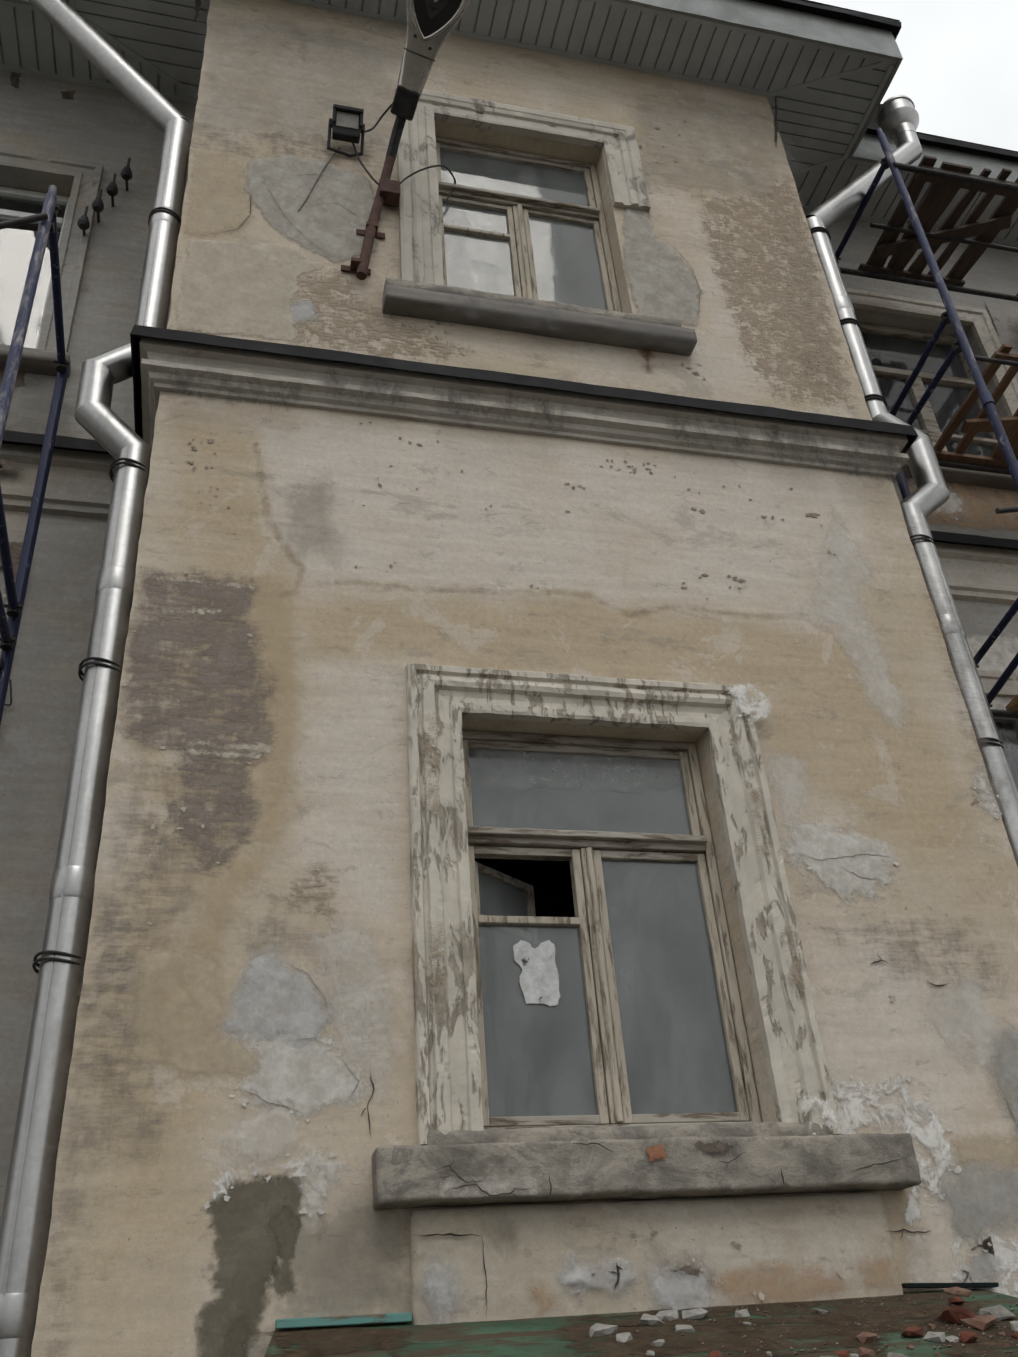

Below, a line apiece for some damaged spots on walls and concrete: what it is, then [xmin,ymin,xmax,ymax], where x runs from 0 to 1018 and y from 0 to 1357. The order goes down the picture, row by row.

flaking render [622,208,702,325]
flaking render [751,787,900,903]
flaking render [228,1026,364,1122]
flaking render [800,1094,840,1135]
flaking render [204,1152,346,1226]
crack [847,1158,906,1171]
leakage [197,1175,303,1357]